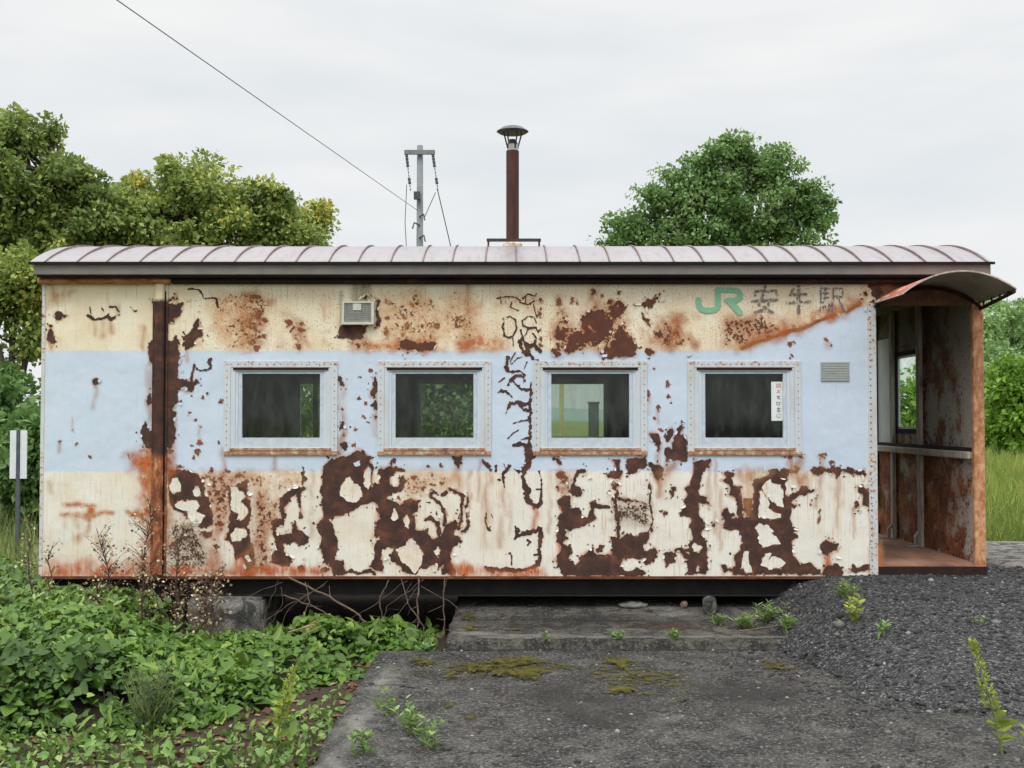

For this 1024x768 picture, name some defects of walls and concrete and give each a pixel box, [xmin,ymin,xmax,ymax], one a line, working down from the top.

corrosion [215,293,268,352]
corrosion [505,288,641,360]
corrosion [725,300,862,359]
corrosion [167,440,203,468]
peeling [167,293,470,576]
peeling [552,420,870,576]